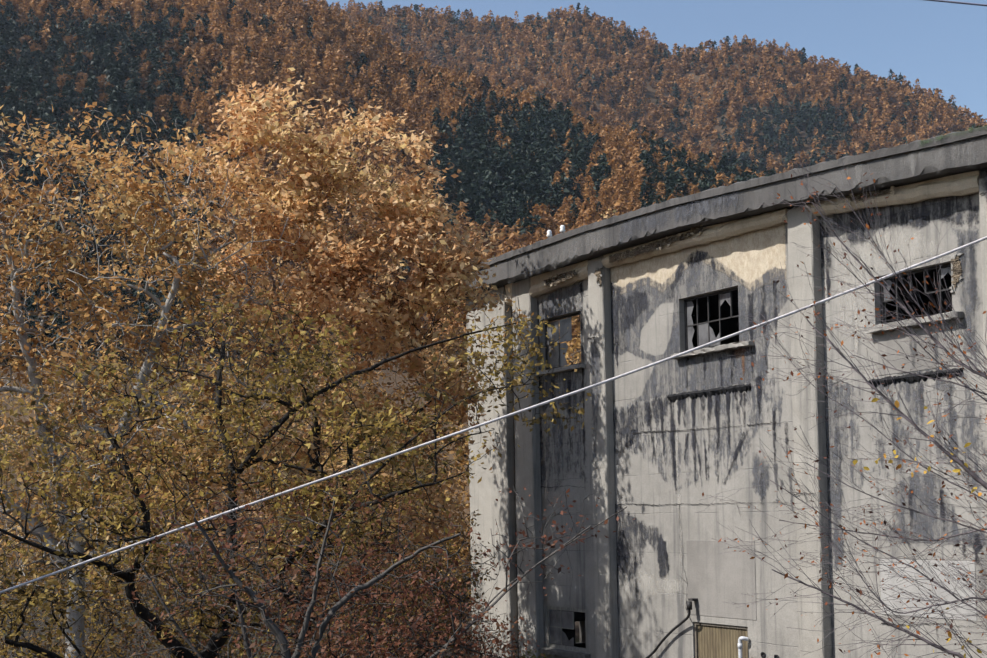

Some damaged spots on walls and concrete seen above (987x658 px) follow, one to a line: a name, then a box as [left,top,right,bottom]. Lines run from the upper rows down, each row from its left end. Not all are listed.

water stain [537,283,601,492]
water stain [611,251,793,515]
water stain [820,195,980,362]
water stain [615,505,679,616]